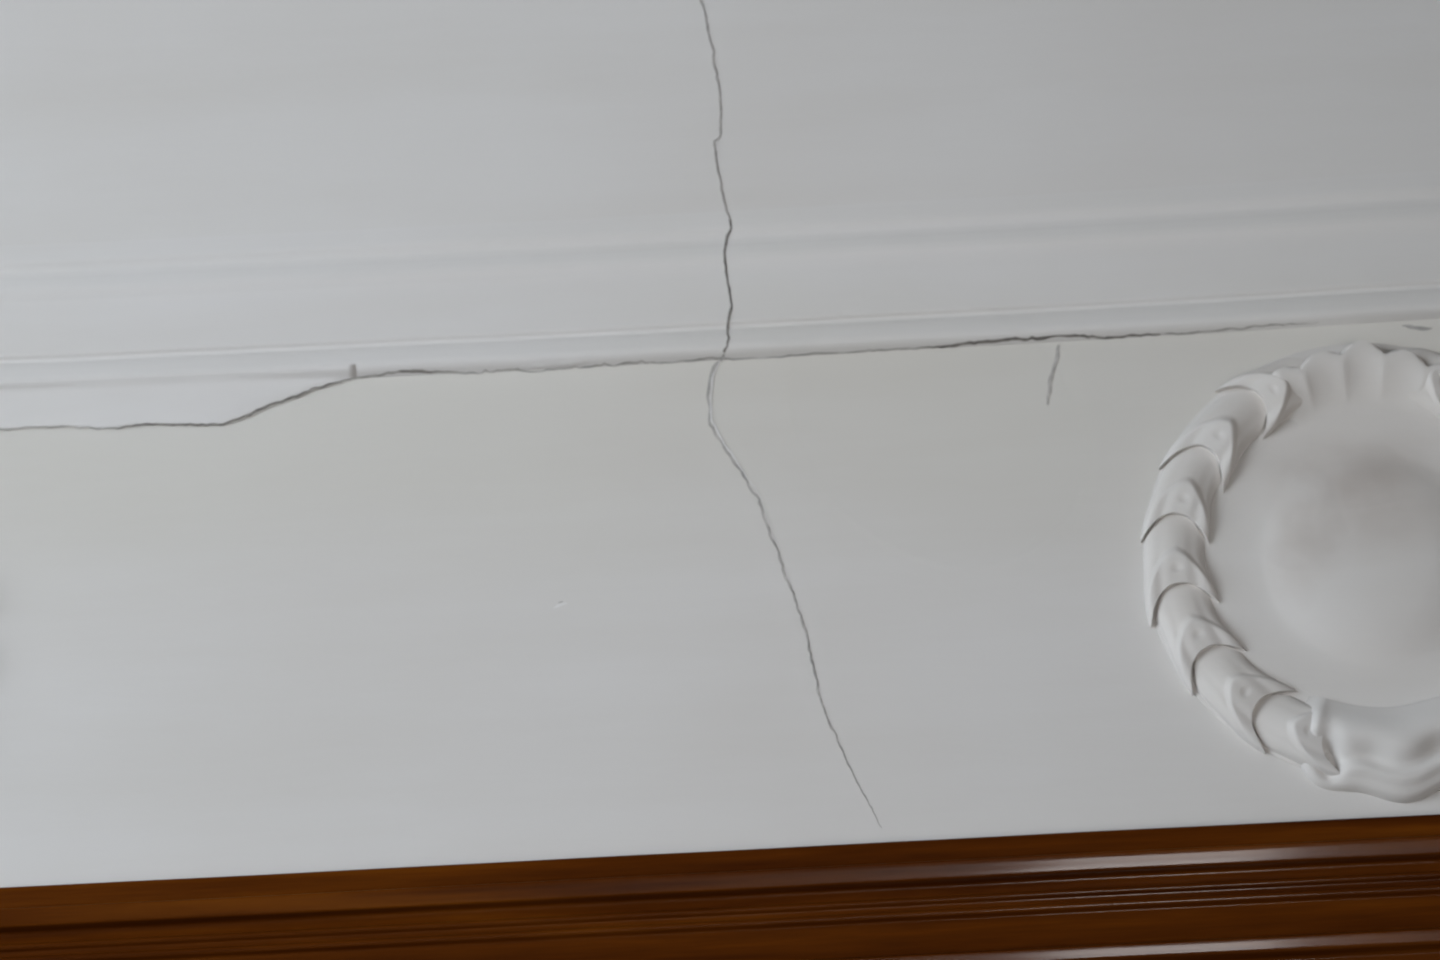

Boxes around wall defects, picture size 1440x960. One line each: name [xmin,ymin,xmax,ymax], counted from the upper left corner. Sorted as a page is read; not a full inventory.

crack [0,0,1318,828]